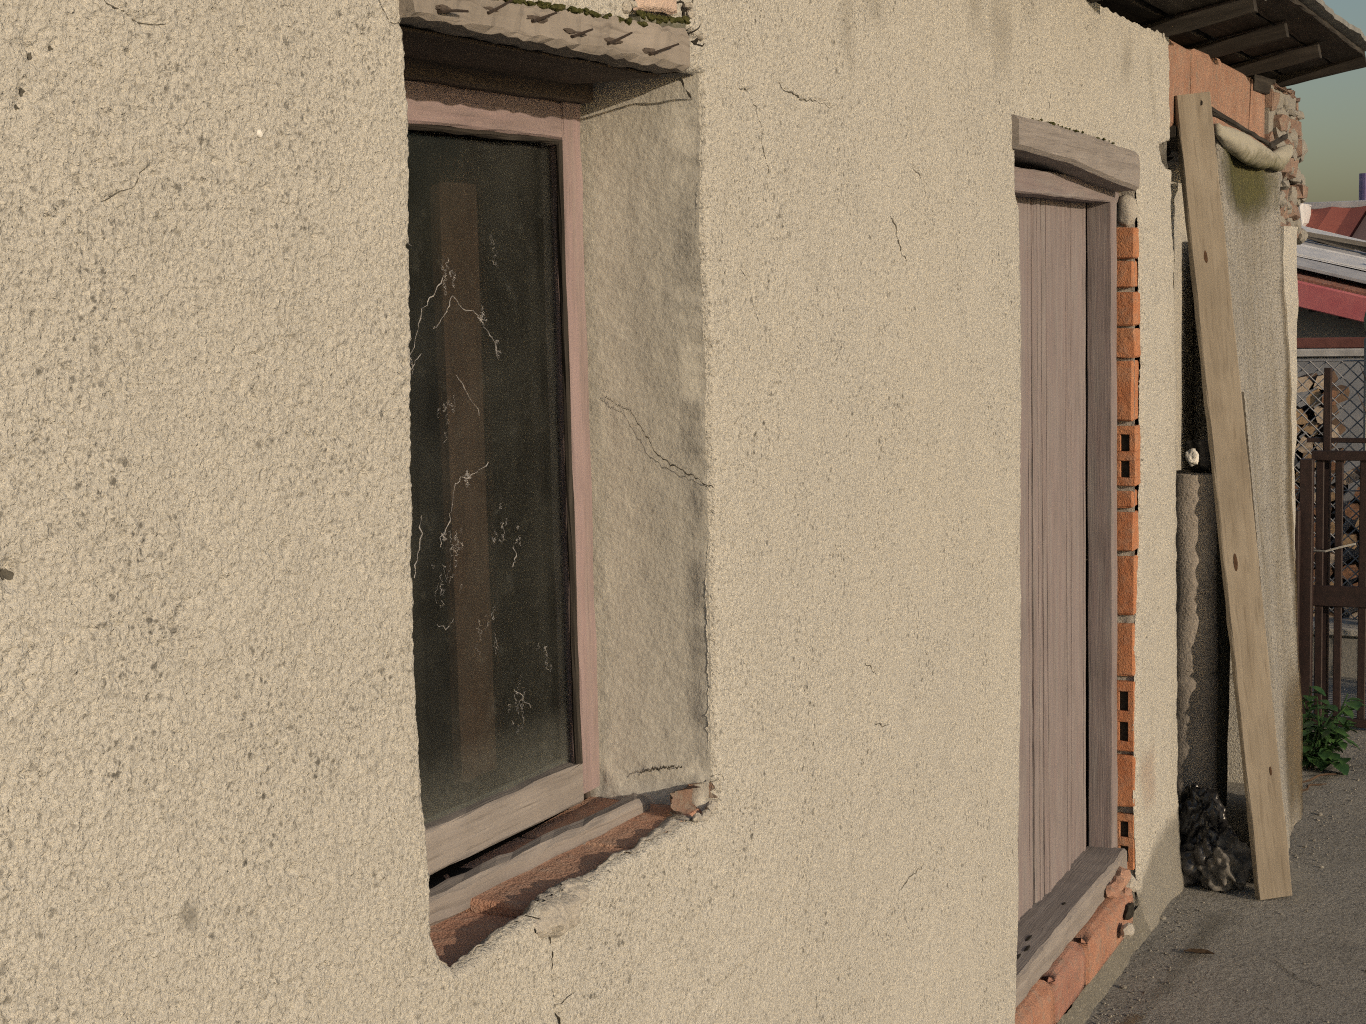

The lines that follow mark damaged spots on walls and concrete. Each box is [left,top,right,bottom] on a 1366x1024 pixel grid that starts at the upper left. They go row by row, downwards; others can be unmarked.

spalling [622,0,707,41]
crack [605,396,714,488]
spalling [670,781,719,823]
crack [522,913,572,1024]